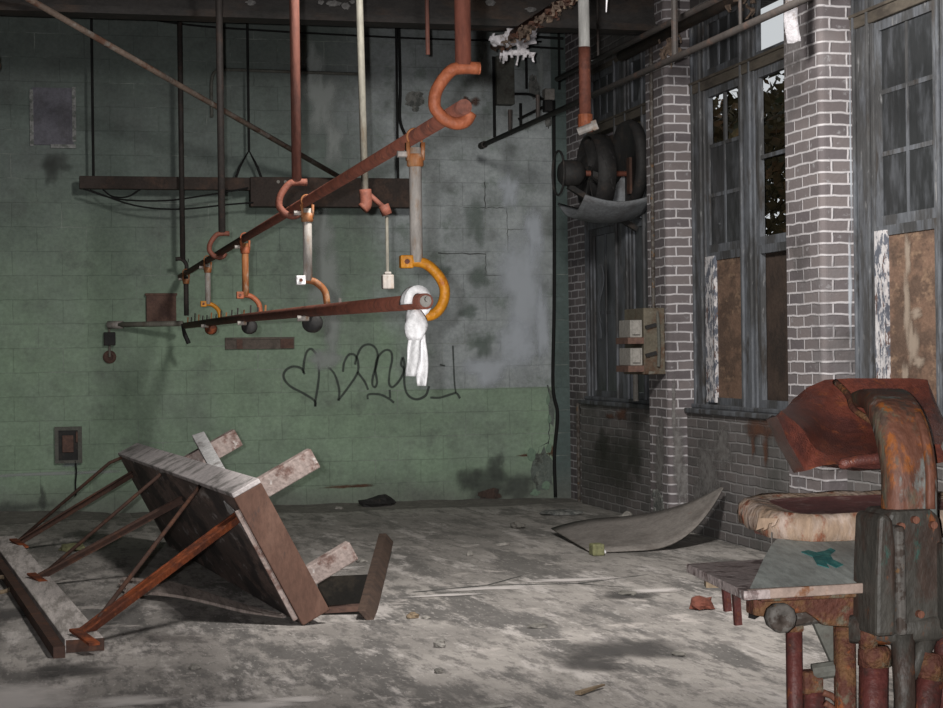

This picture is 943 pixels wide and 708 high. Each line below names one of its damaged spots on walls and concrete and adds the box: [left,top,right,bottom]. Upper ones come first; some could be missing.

peeling [527,444,553,496]